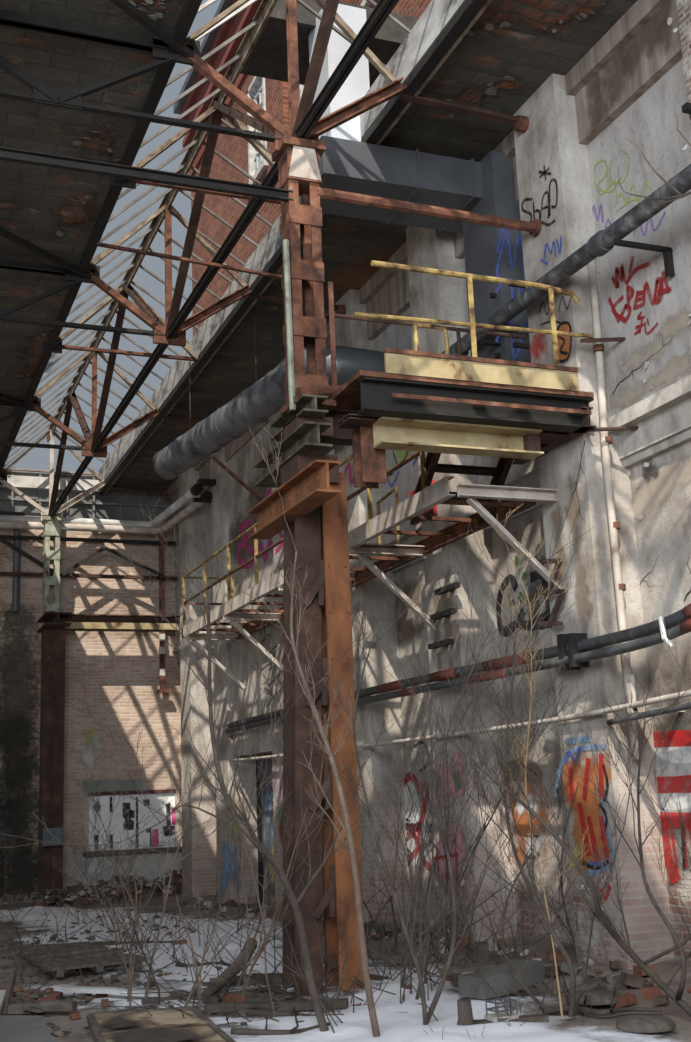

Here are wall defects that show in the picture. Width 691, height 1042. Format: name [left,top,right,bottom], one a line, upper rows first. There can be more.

water stain [0,606,41,904]